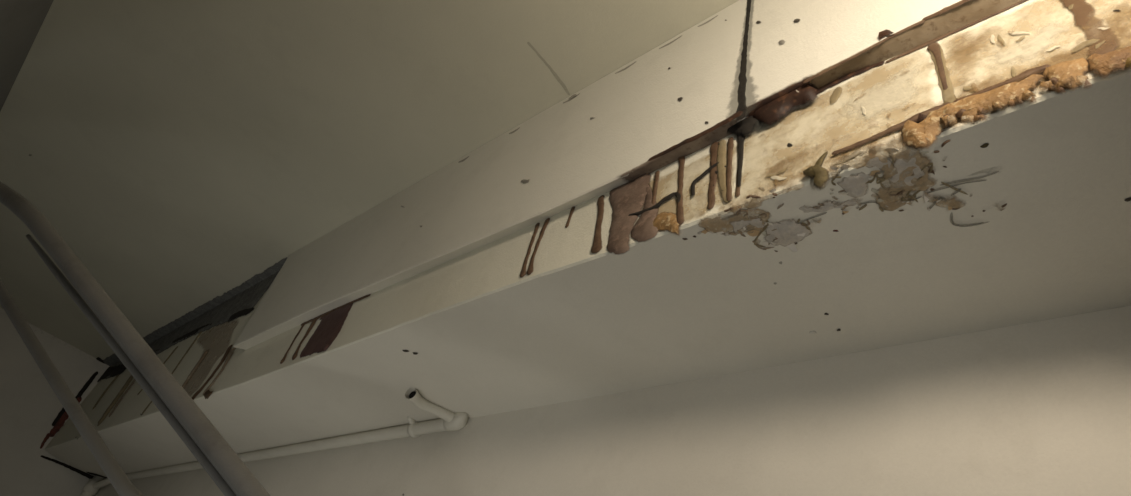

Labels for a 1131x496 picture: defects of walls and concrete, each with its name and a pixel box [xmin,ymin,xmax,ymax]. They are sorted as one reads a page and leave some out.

crack [628,0,759,216]
rust [591,0,1027,255]
rust [832,46,1131,155]
rust [520,218,550,277]
peeling [683,139,986,252]
spalling [96,353,126,382]
spalling [143,257,287,355]
rust [280,294,370,364]